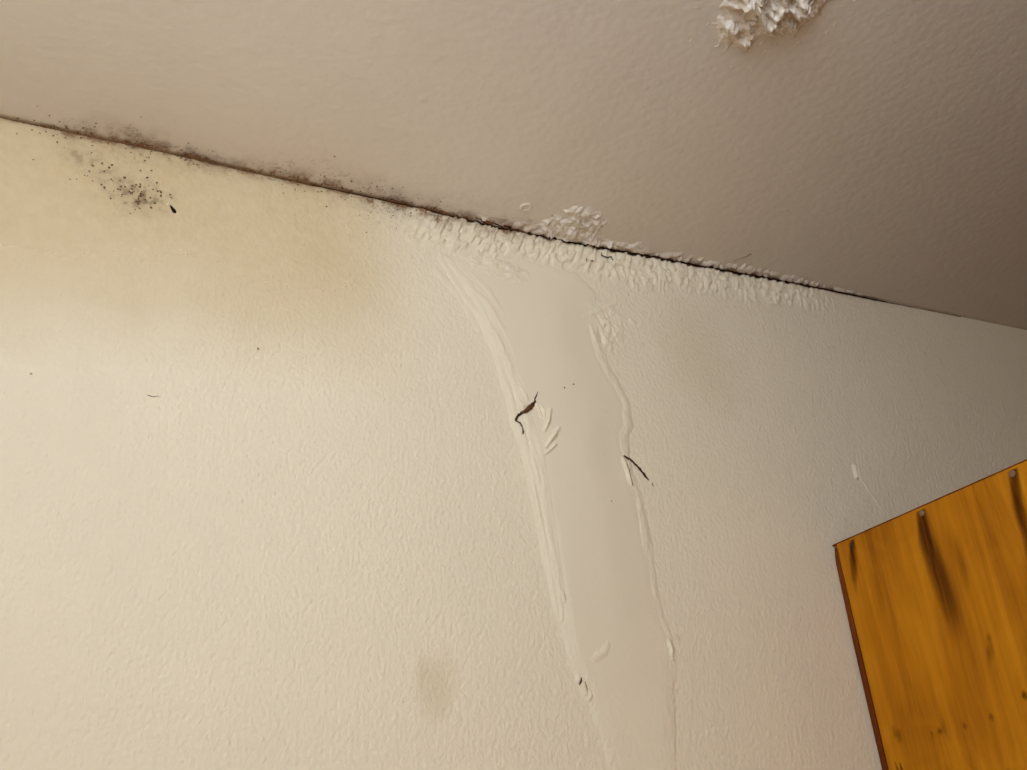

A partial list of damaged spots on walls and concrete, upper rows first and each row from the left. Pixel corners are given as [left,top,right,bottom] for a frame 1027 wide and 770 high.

spalling [683,0,839,71]
leakage [0,115,218,221]
crack [135,146,961,317]
crack [515,392,538,434]
crack [624,455,653,485]